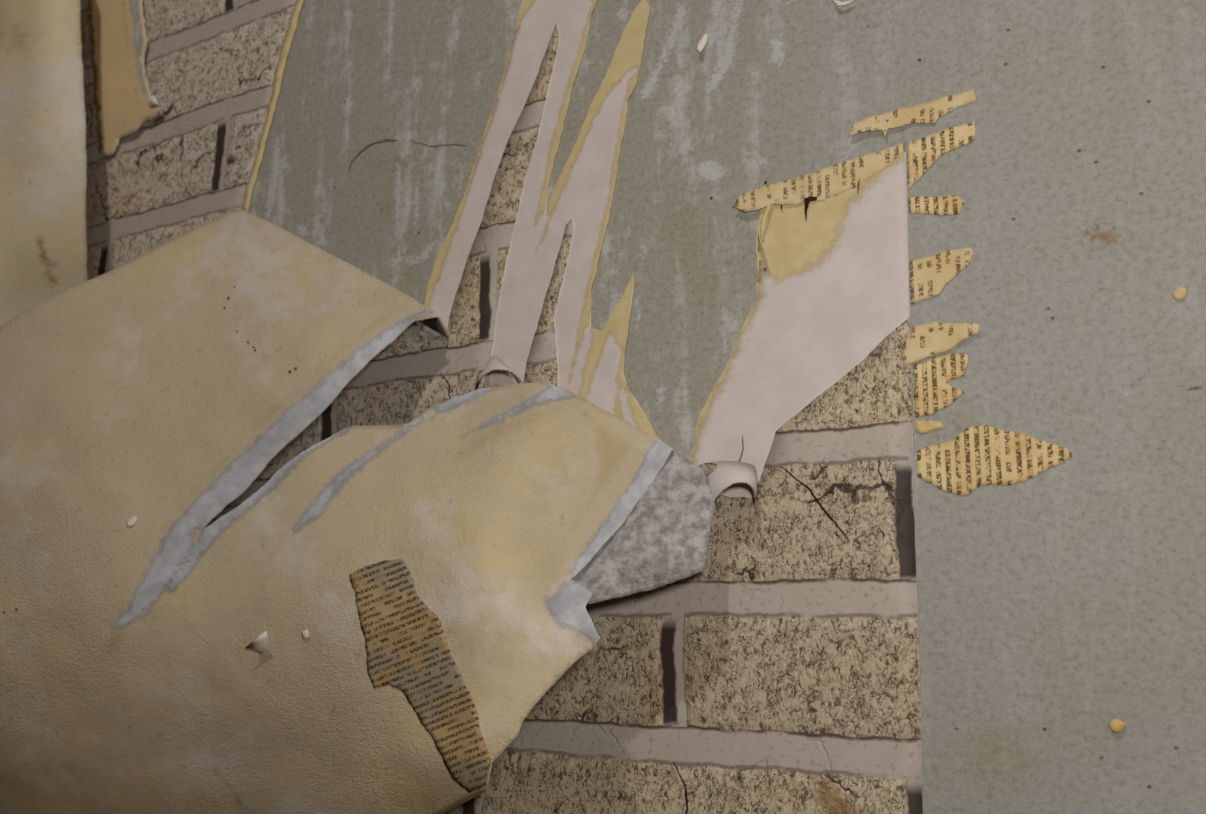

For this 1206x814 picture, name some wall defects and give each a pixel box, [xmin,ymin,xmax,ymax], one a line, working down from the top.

water stain [638,3,687,101]
spalling [697,33,708,53]
water stain [706,0,743,94]
crack [348,139,466,171]
water stain [696,161,729,183]
crack [782,467,849,541]